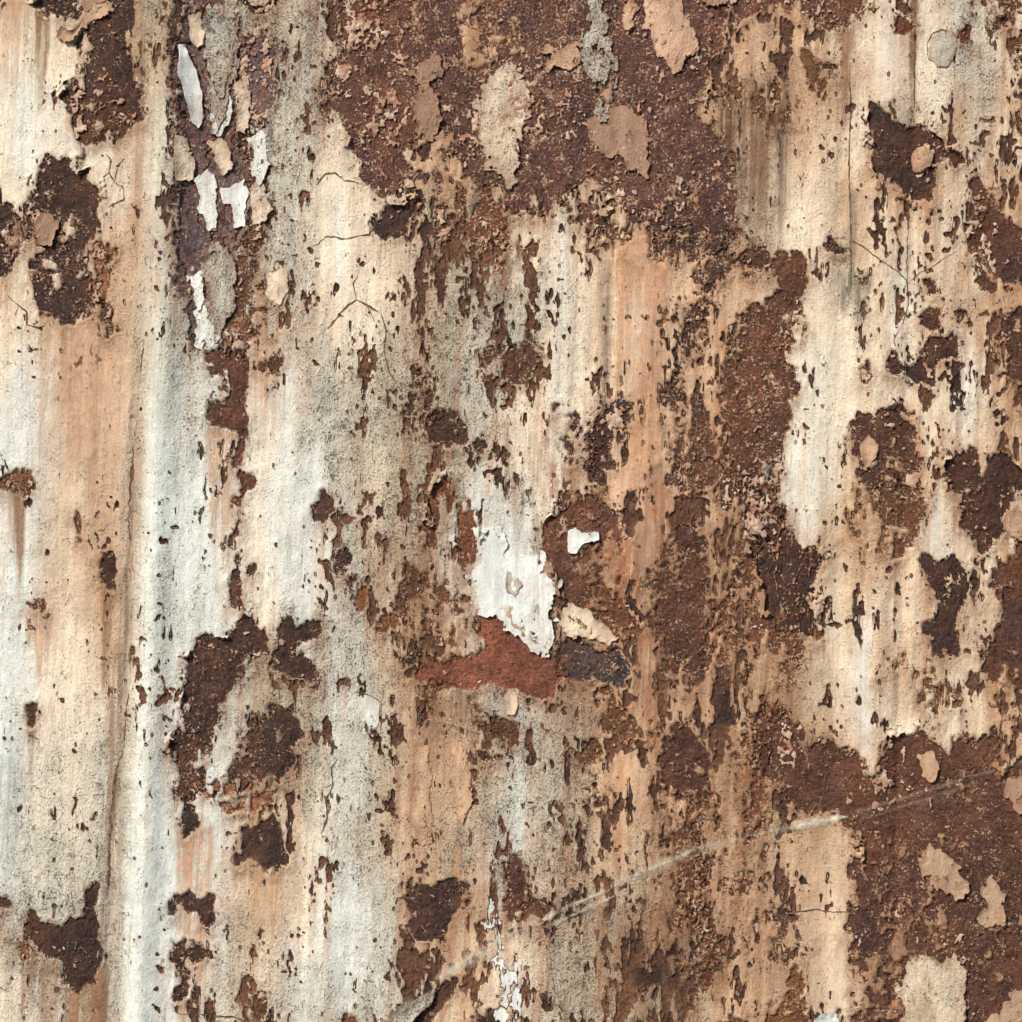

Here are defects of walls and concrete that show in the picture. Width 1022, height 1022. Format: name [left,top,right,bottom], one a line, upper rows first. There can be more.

peeling [542,0,699,179]
crack [316,172,357,185]
crack [312,228,374,246]
crack [328,276,396,382]
rust [847,281,885,384]
peeling [465,526,619,658]
rust [364,694,407,769]
rust [277,856,339,987]
crack [770,906,851,914]
peeling [918,842,1006,928]
rust [225,925,290,1022]
peeling [894,953,967,1022]